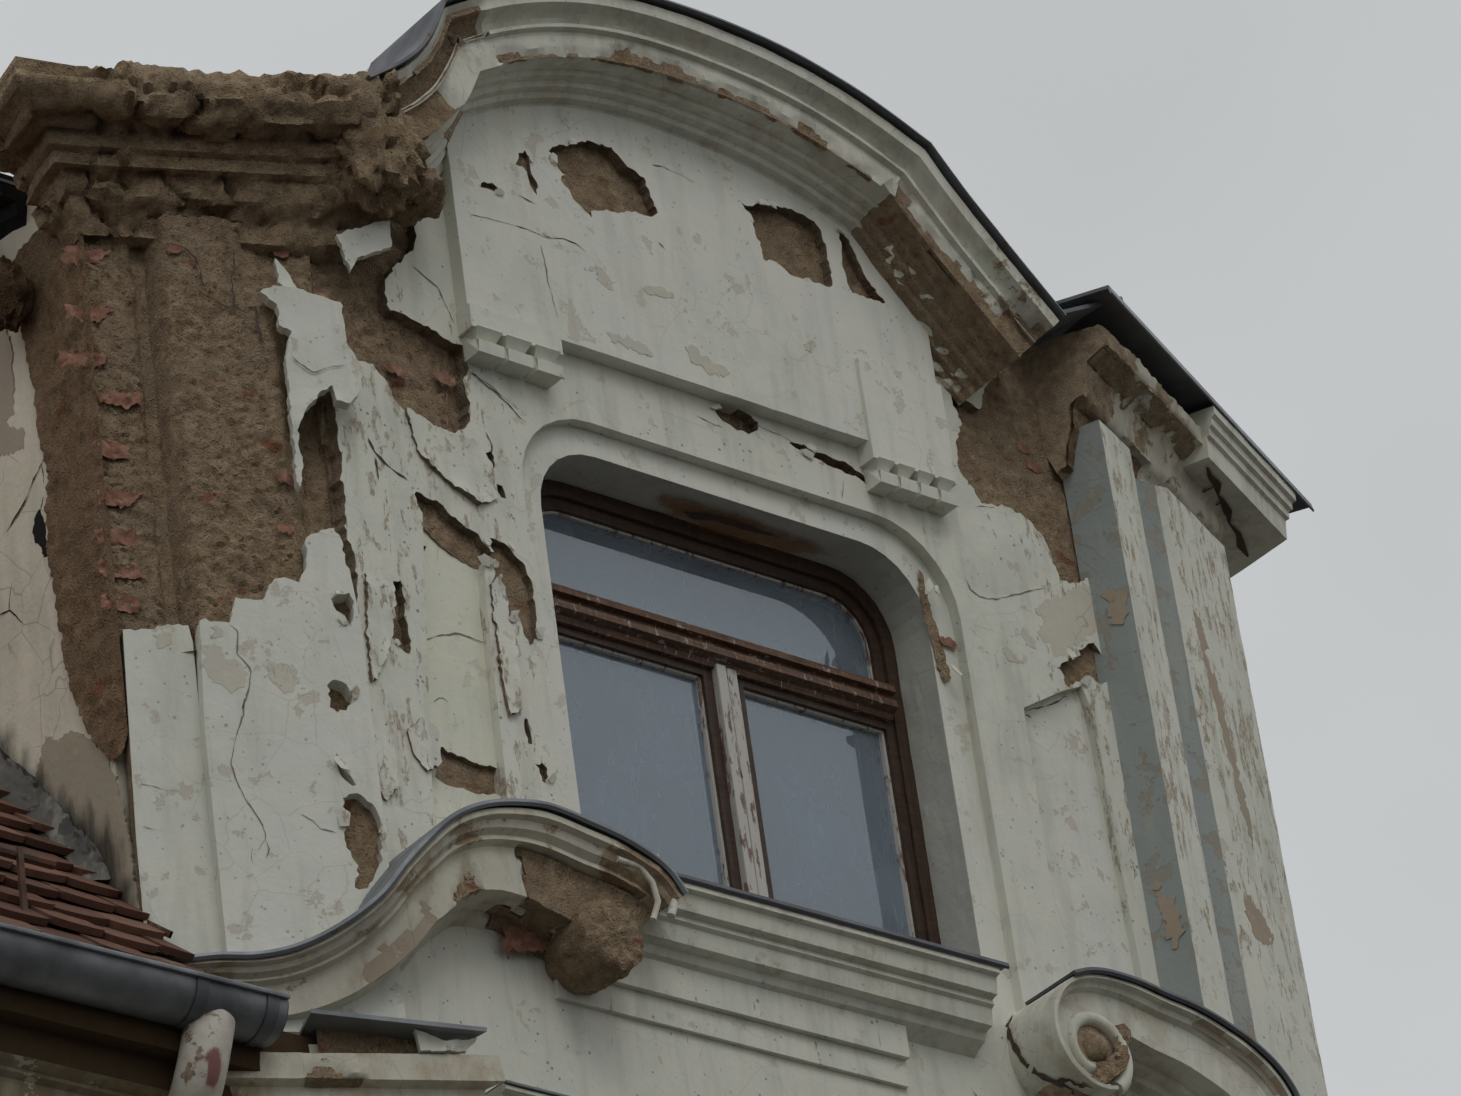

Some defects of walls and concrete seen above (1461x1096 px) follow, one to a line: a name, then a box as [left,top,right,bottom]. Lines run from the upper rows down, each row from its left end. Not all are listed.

flaking render [516,136,650,216]
flaking render [747,199,825,286]
flaking render [836,227,870,299]
spalling [1088,348,1197,460]
crack [7,459,44,532]
flaking render [0,213,498,909]
flaking render [952,359,1129,686]
flaking render [918,570,963,683]
crack [230,626,270,861]
flaking render [502,900,644,993]
flaking render [1082,1023,1132,1088]